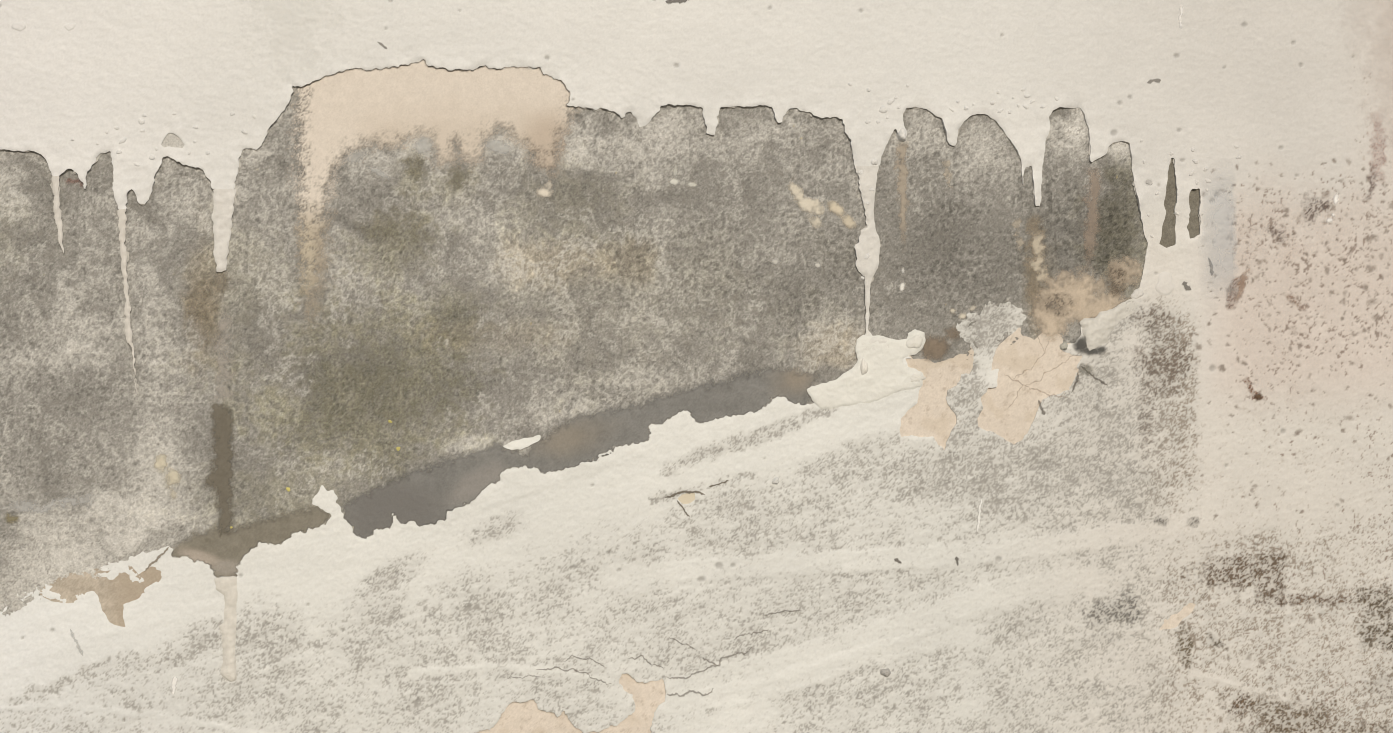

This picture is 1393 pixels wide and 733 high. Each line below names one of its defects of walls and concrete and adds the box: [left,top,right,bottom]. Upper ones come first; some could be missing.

peeling [0,60,1200,630]
damp [923,329,959,359]
damp [1013,220,1141,354]
damp [206,322,234,536]
damp [1091,598,1140,622]
flaking render [477,674,666,733]